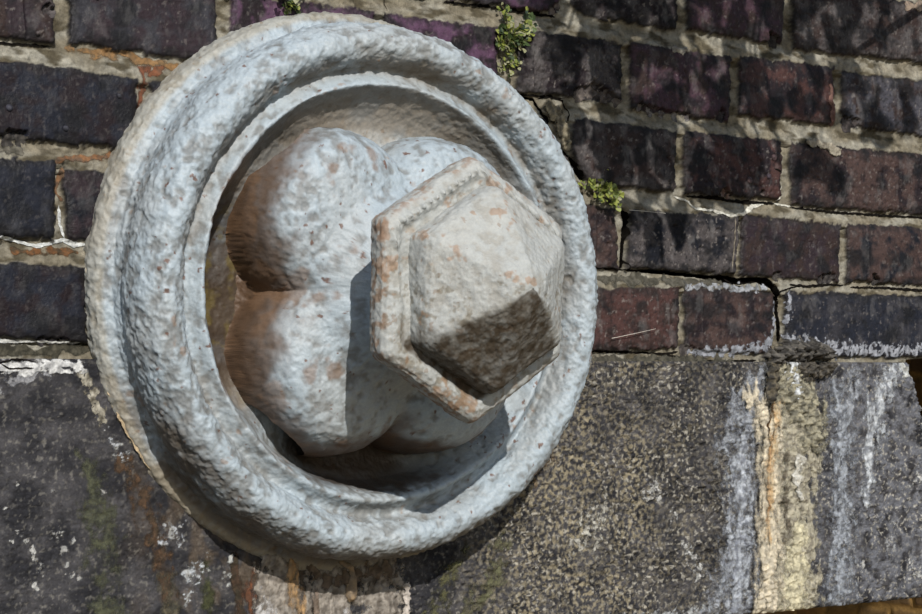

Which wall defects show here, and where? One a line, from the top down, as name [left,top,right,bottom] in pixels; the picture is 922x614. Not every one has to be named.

damp [597,272,767,294]
crack [596,210,798,342]
damp [0,340,113,427]
damp [591,290,922,614]